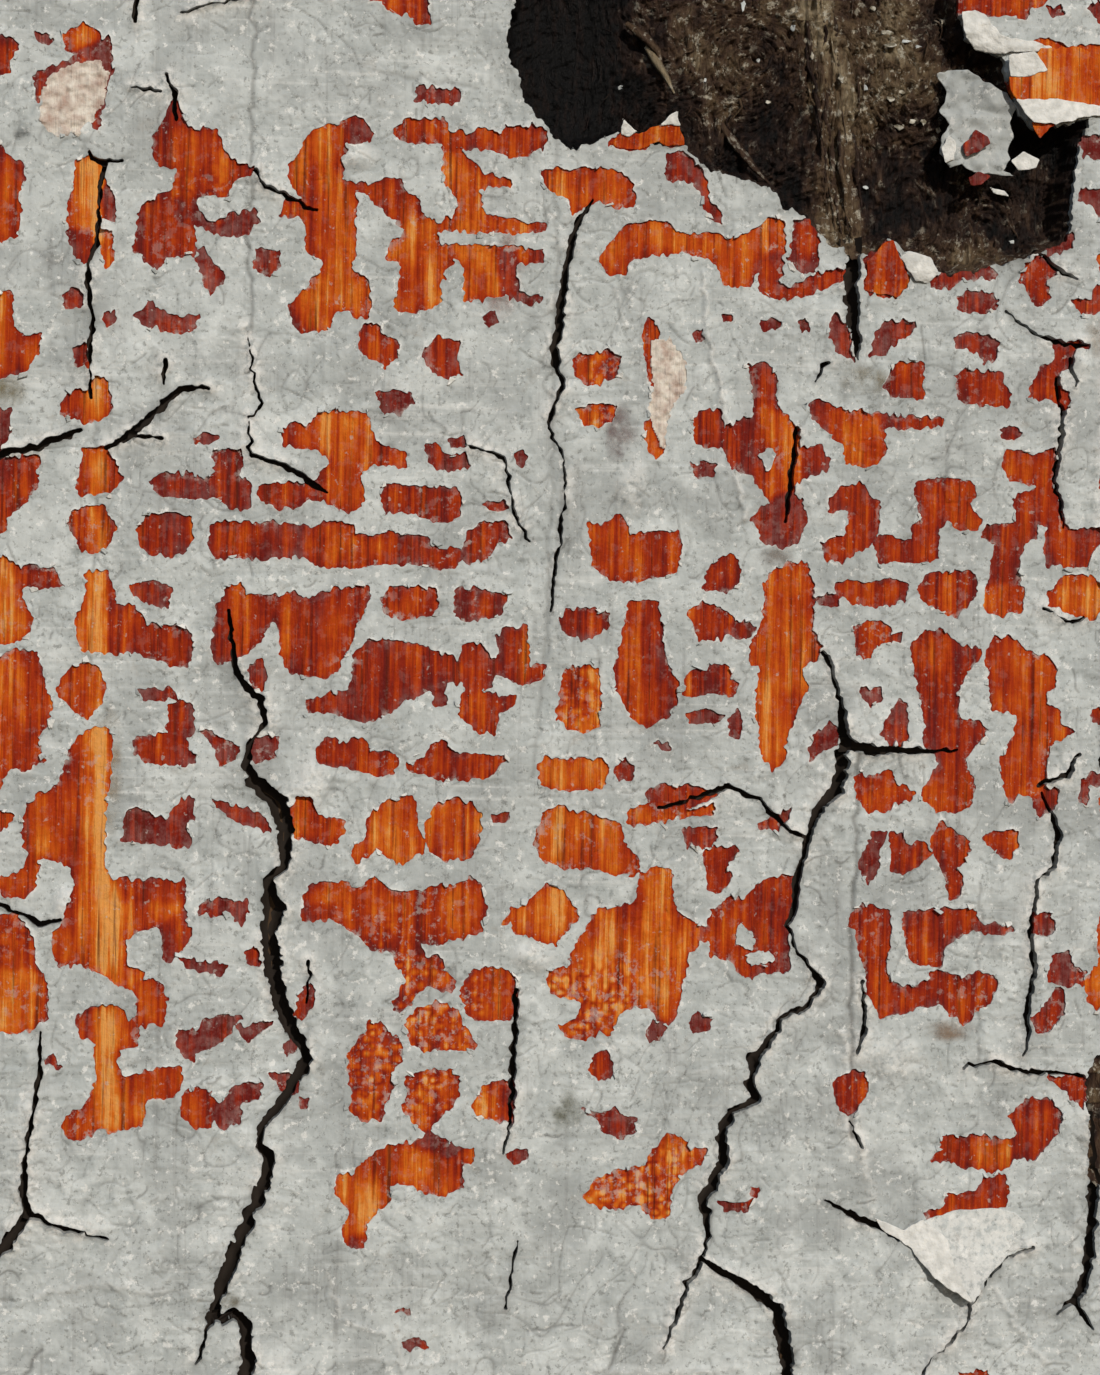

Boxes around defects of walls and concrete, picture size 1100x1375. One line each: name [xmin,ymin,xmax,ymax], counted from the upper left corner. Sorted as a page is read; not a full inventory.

crack [0,151,210,460]
peeling [132,100,281,296]
peeling [279,84,548,370]
crack [465,200,593,612]
peeling [540,111,846,302]
peeling [863,239,999,314]
peeling [0,312,1100,1249]
crack [0,1031,108,1255]
crack [195,609,312,1375]
crack [657,651,955,1375]
peeling [875,1074,1087,1303]
crack [1062,1111,1100,1328]